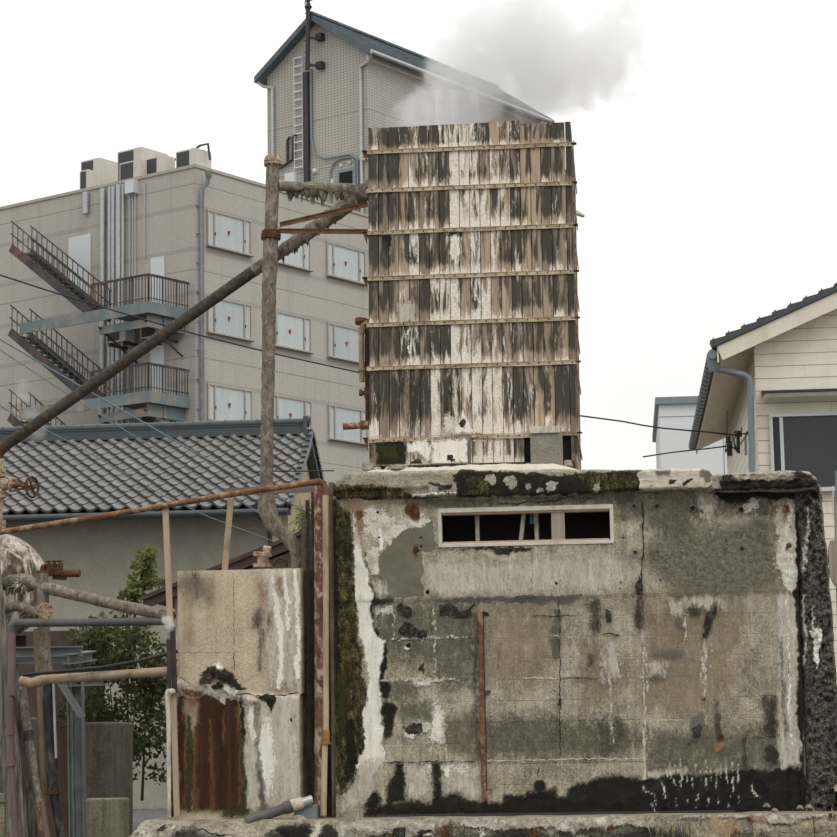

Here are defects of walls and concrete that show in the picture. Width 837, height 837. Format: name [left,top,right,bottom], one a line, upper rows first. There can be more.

water stain [447,231,463,265]
water stain [377,330,474,464]
peeling [363,504,431,596]
rust [177,694,243,812]
water stain [176,568,301,811]
spalling [375,603,427,648]
rust [478,610,492,804]
water stain [333,484,837,837]
water stain [172,826,222,837]
water stain [264,823,347,837]